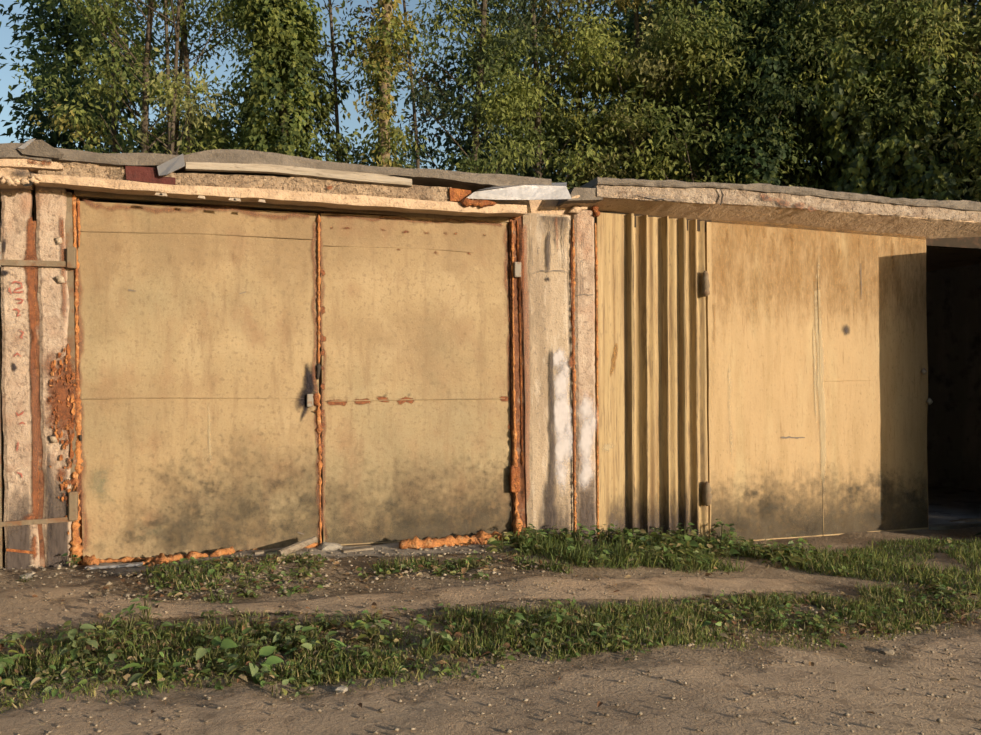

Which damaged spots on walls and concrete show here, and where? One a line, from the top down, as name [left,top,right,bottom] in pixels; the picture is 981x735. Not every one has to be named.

corrosion [84,200,309,219]
damp [541,215,568,270]
corrosion [24,217,87,547]
corrosion [312,214,530,537]
damp [331,491,511,544]
damp [540,351,569,541]
damp [581,480,699,544]
damp [711,266,928,541]